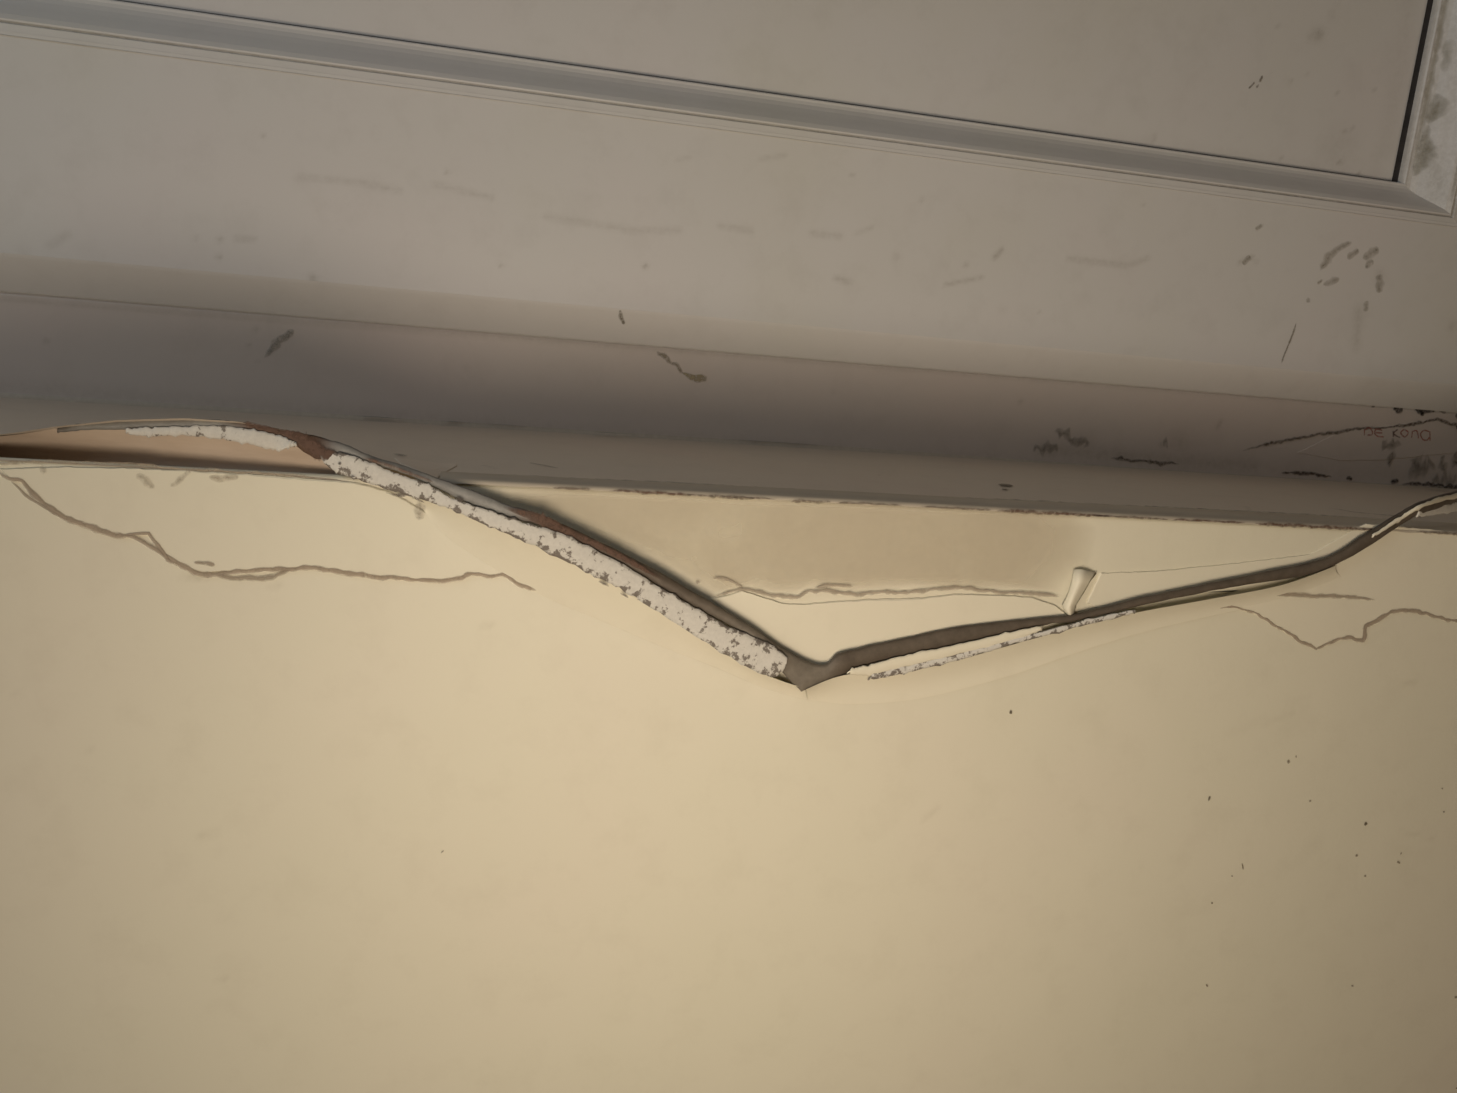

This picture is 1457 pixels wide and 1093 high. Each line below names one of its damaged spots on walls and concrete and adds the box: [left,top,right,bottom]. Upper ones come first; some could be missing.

peeling [0,429,500,580]
crack [1,474,532,590]
peeling [440,471,1457,676]
crack [1222,593,1457,650]